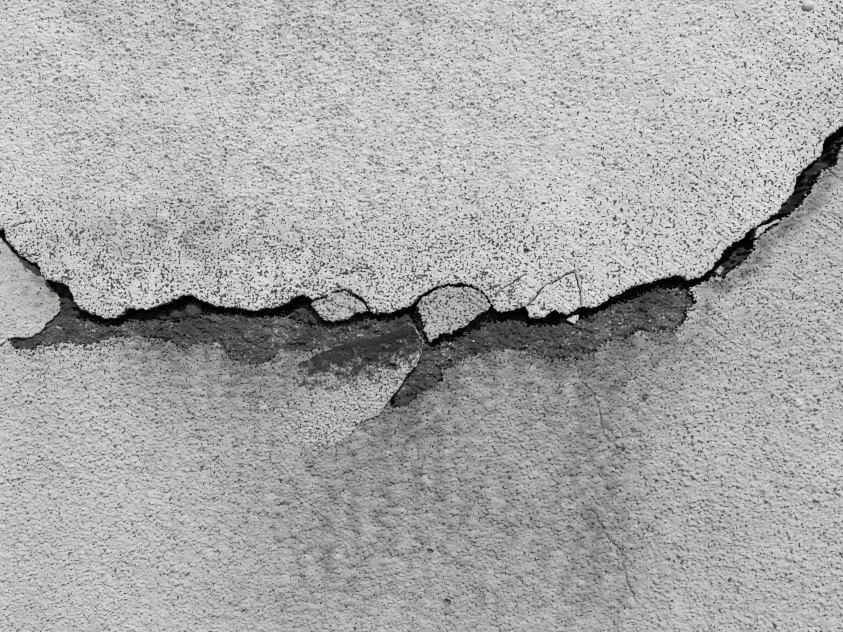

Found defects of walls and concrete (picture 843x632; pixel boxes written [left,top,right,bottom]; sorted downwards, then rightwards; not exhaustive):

crack [0,126,843,349]
spalling [9,283,696,449]